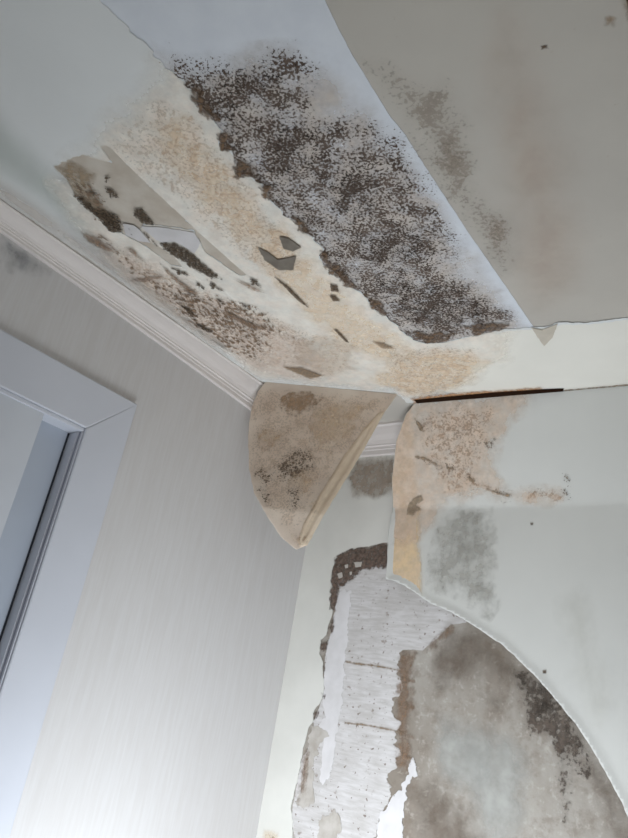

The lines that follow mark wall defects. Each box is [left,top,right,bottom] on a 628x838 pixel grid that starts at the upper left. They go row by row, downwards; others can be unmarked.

damp [62,49,524,538]
crack [414,385,628,404]
damp [329,543,388,610]
damp [441,733,516,837]
damp [515,671,590,823]